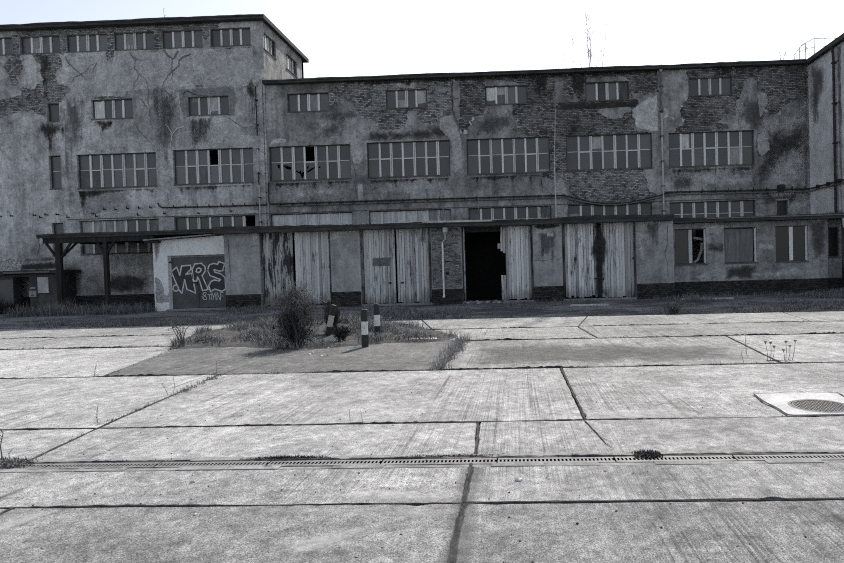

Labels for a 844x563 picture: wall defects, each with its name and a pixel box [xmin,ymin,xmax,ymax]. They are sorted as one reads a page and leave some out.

water stain [41,101,83,149]
peeling [0,23,254,118]
crack [129,49,197,150]
water stain [192,119,246,143]
flaking render [329,71,668,205]
water stain [674,167,749,188]
flaking render [674,65,808,133]
water stain [743,100,763,128]
peeling [757,135,769,156]
water stain [759,130,806,182]
water stain [784,69,823,121]
water stain [592,224,607,295]